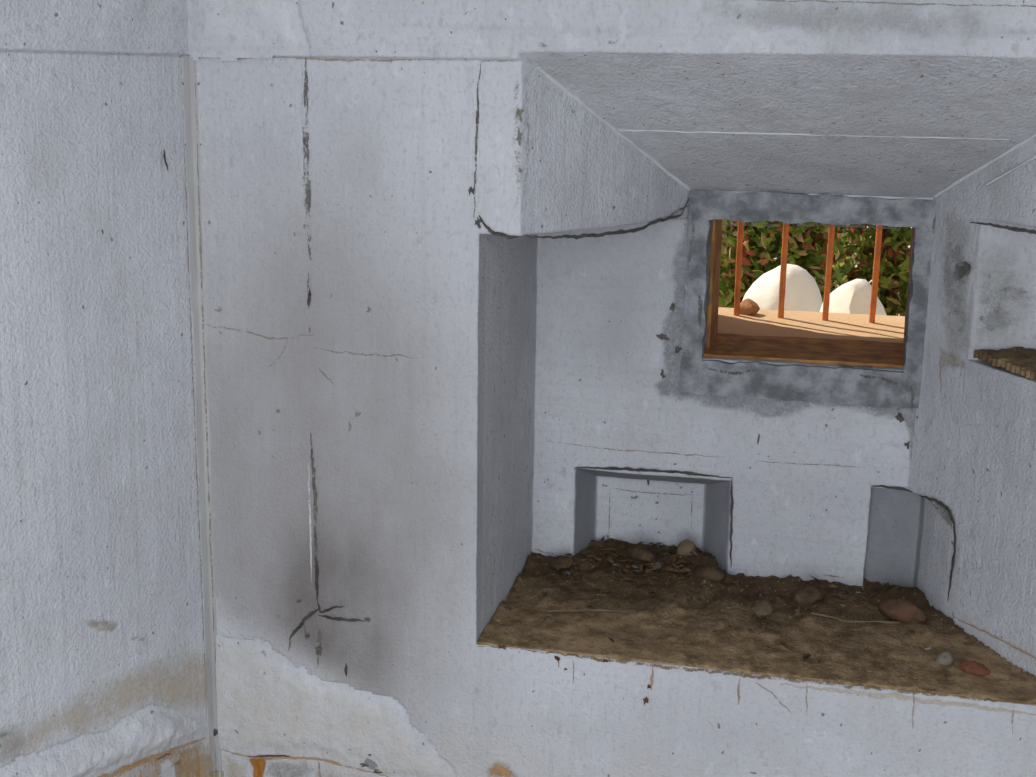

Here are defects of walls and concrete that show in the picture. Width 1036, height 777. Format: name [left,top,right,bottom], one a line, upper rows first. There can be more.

crack [468,60,695,267]
crack [696,296,704,326]
crack [163,57,445,709]
rust [249,758,276,777]
damp [140,737,388,777]